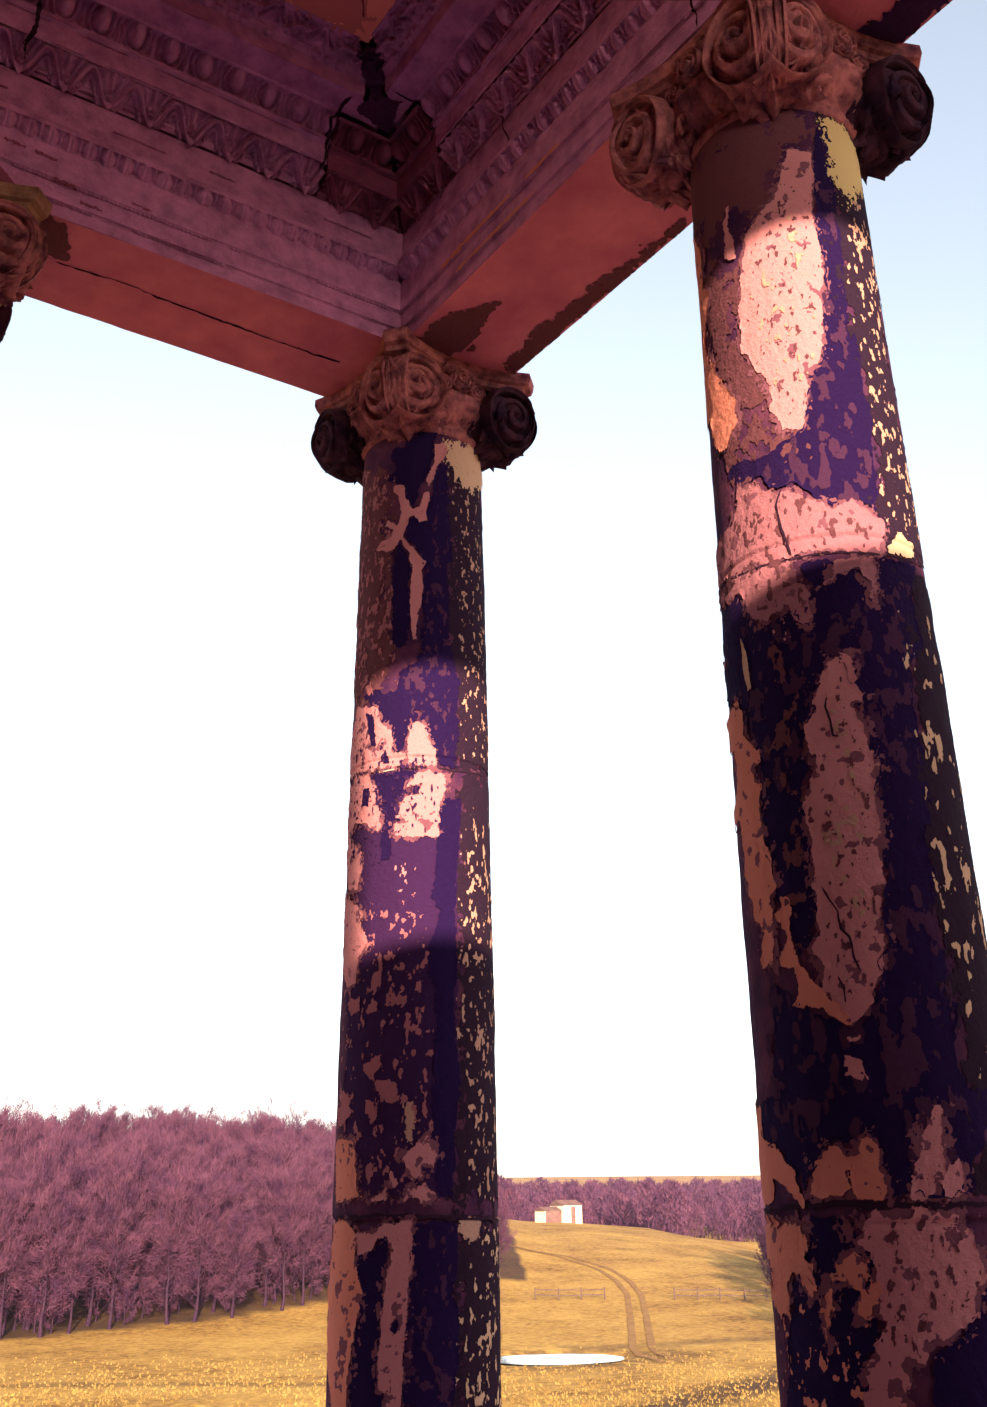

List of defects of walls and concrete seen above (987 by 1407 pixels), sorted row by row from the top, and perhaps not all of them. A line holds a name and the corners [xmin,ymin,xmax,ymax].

crack [23,0,42,59]
crack [318,96,353,169]
peeling [693,239,738,452]
peeling [722,116,863,430]
peeling [377,434,483,639]
peeling [716,484,914,624]
peeling [342,706,446,1015]
spalling [726,639,886,1080]
peeling [327,1054,437,1407]
peeling [458,1216,481,1244]
spalling [754,1098,987,1407]